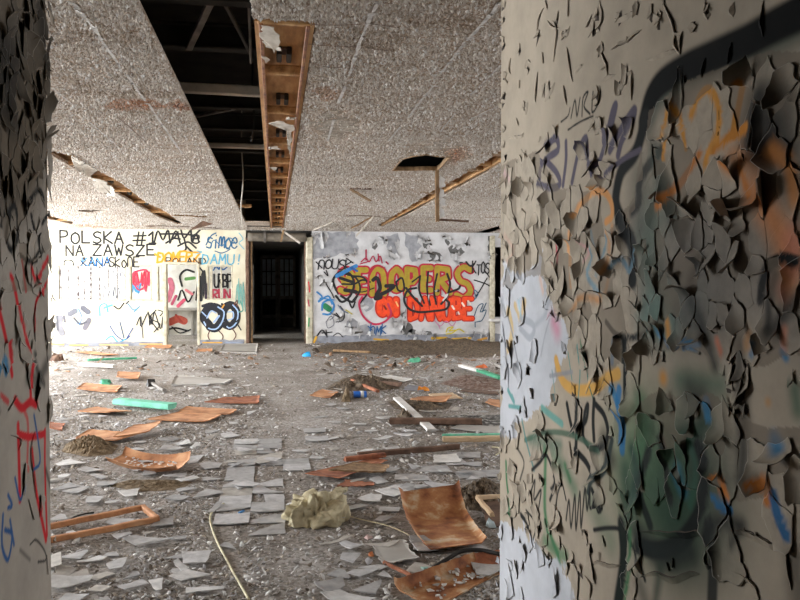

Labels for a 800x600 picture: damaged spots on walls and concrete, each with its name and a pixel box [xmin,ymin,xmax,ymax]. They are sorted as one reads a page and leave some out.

spalling [392,154,451,171]
peeling [0,0,59,422]
peeling [311,231,359,262]
peeling [372,232,471,266]
peeling [486,55,800,600]